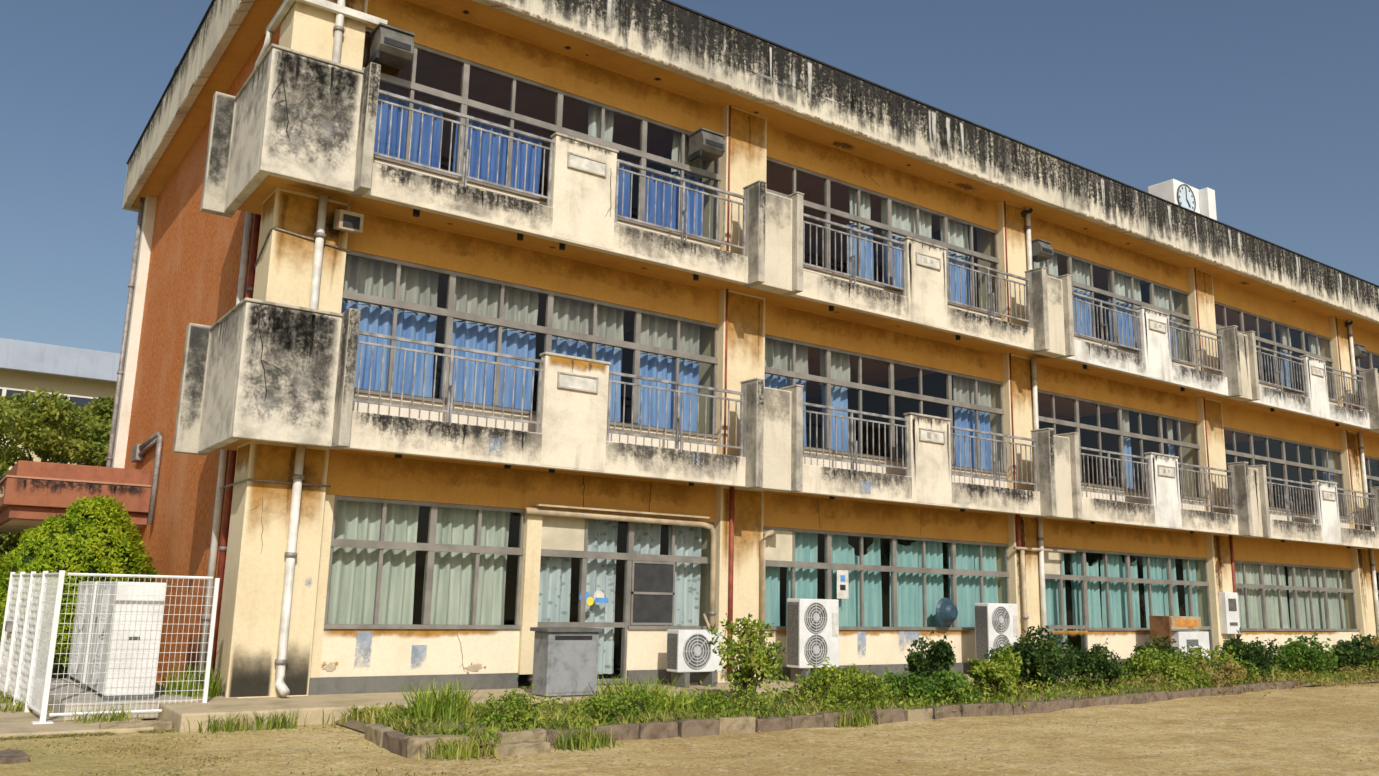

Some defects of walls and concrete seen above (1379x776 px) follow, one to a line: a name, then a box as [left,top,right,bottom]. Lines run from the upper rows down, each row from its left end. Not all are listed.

leakage [252,50,380,161]
leakage [209,95,235,179]
leakage [381,165,538,212]
leakage [186,319,227,420]
leakage [248,303,359,423]
leakage [1085,309,1170,364]
leakage [236,444,325,510]
leakage [362,413,527,447]
leakage [620,443,740,469]
leakage [185,648,216,682]
leakage [220,658,308,697]